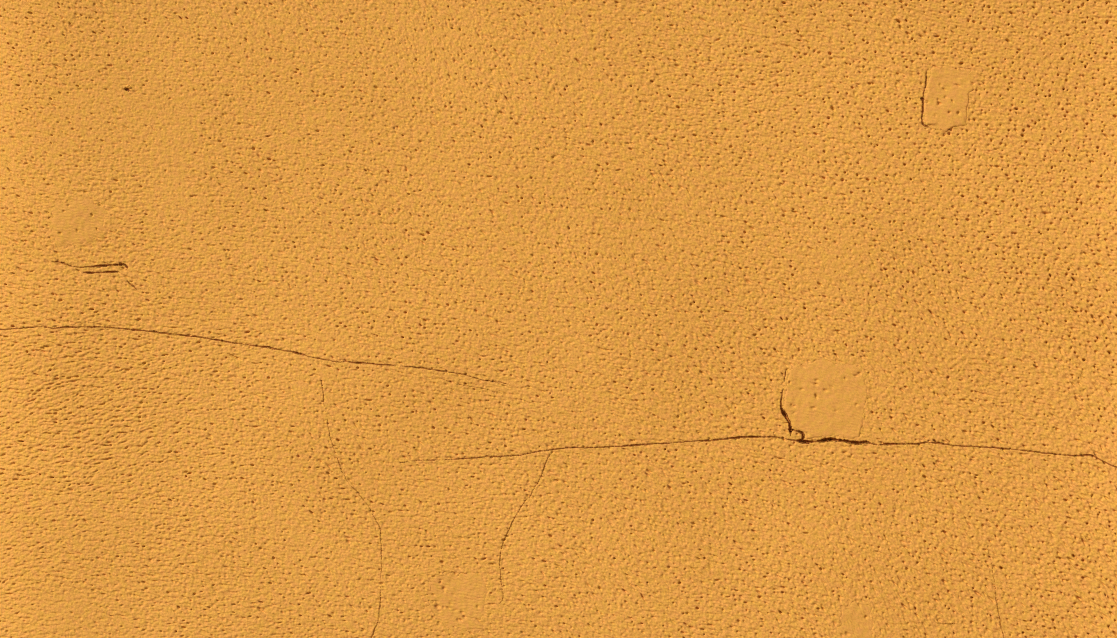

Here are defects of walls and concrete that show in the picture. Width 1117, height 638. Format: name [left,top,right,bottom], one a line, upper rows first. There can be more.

crack [55,261,137,290]
crack [0,326,506,638]
crack [401,371,1117,603]